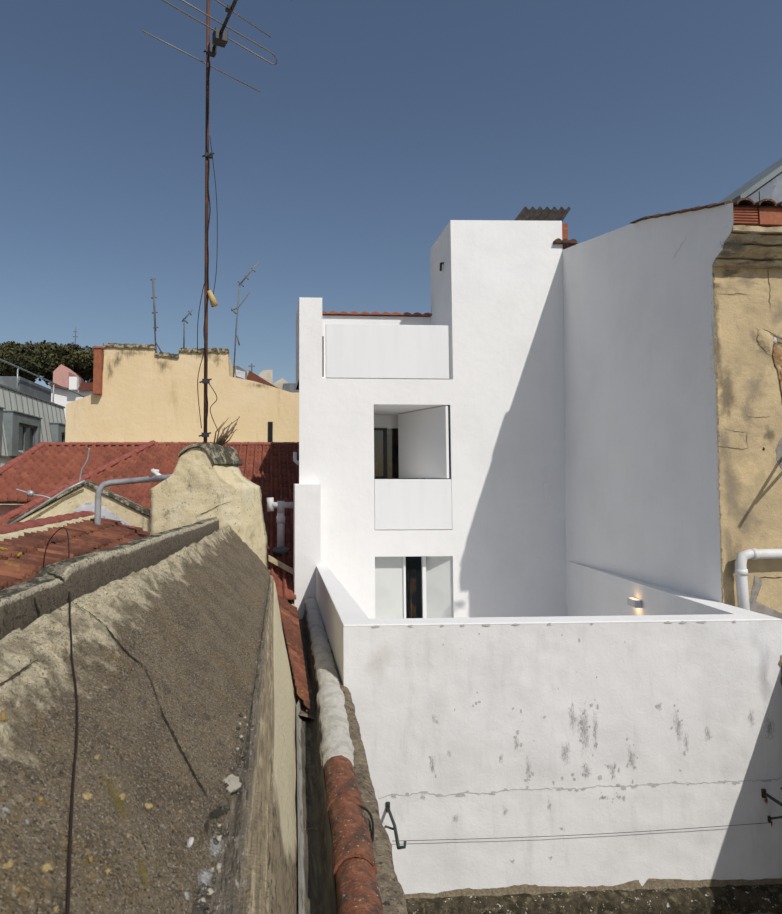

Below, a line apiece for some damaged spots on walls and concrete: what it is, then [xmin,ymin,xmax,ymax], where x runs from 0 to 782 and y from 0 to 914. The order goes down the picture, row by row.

water stain [720,233,759,257]
spalling [772,337,782,396]
crack [74,603,213,802]
crack [378,777,782,799]